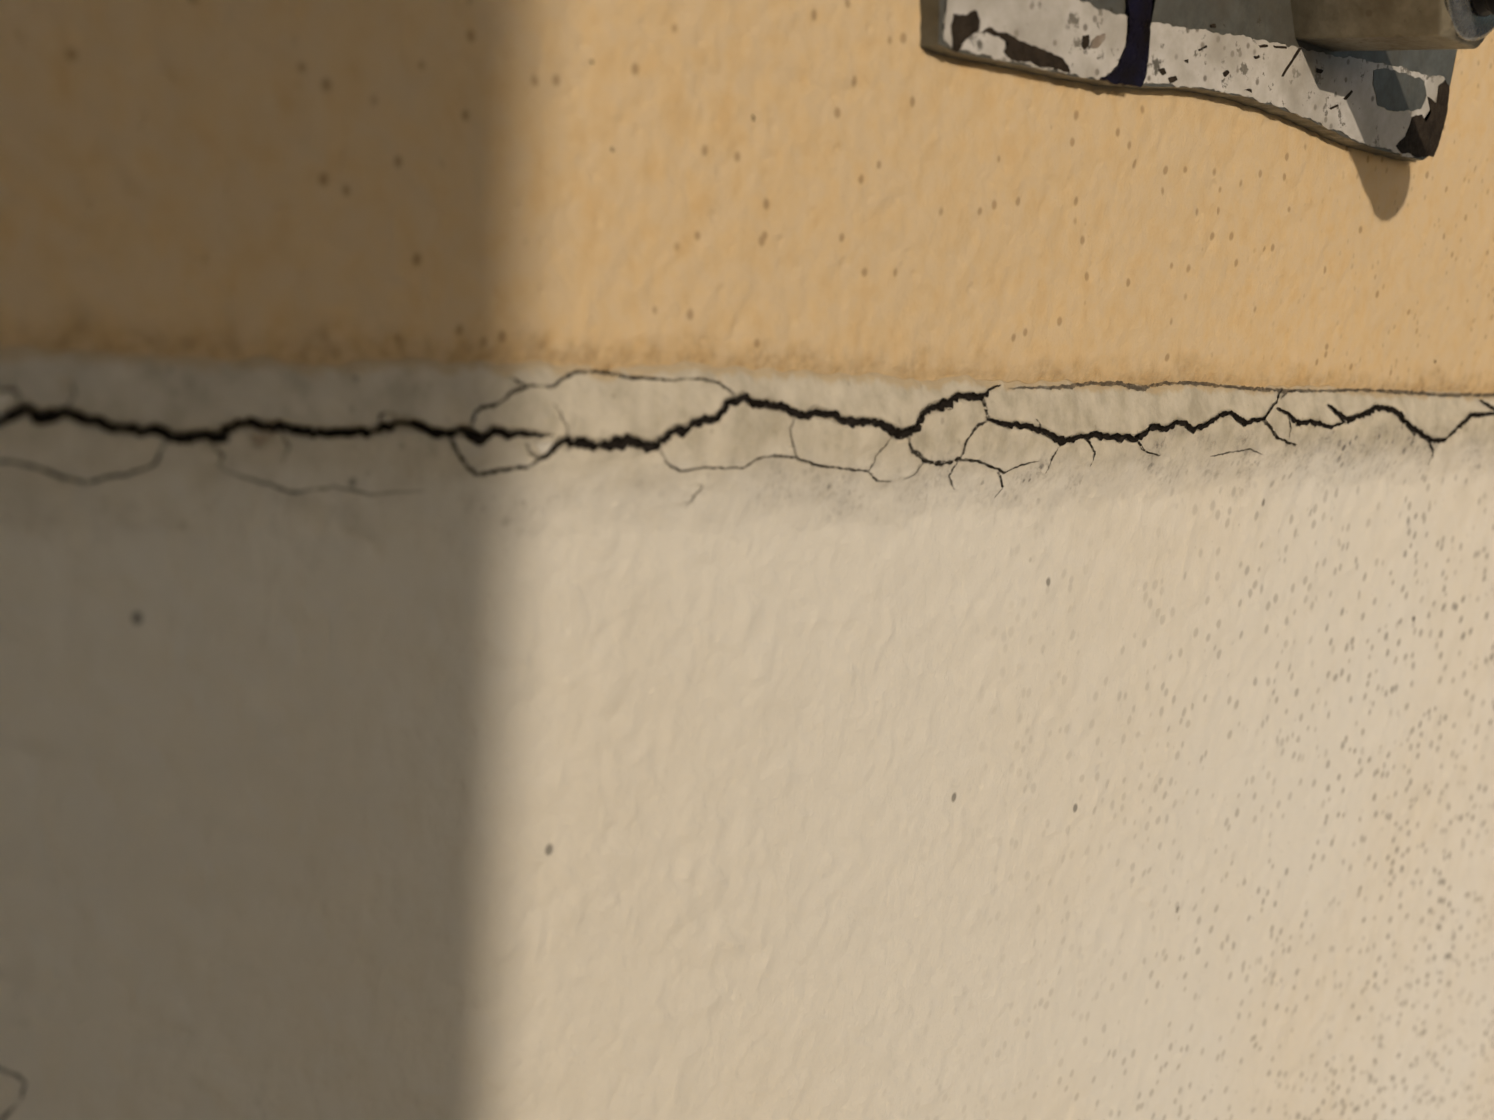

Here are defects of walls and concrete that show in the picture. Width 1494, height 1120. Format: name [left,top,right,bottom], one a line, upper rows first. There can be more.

crack [0,369,1494,503]